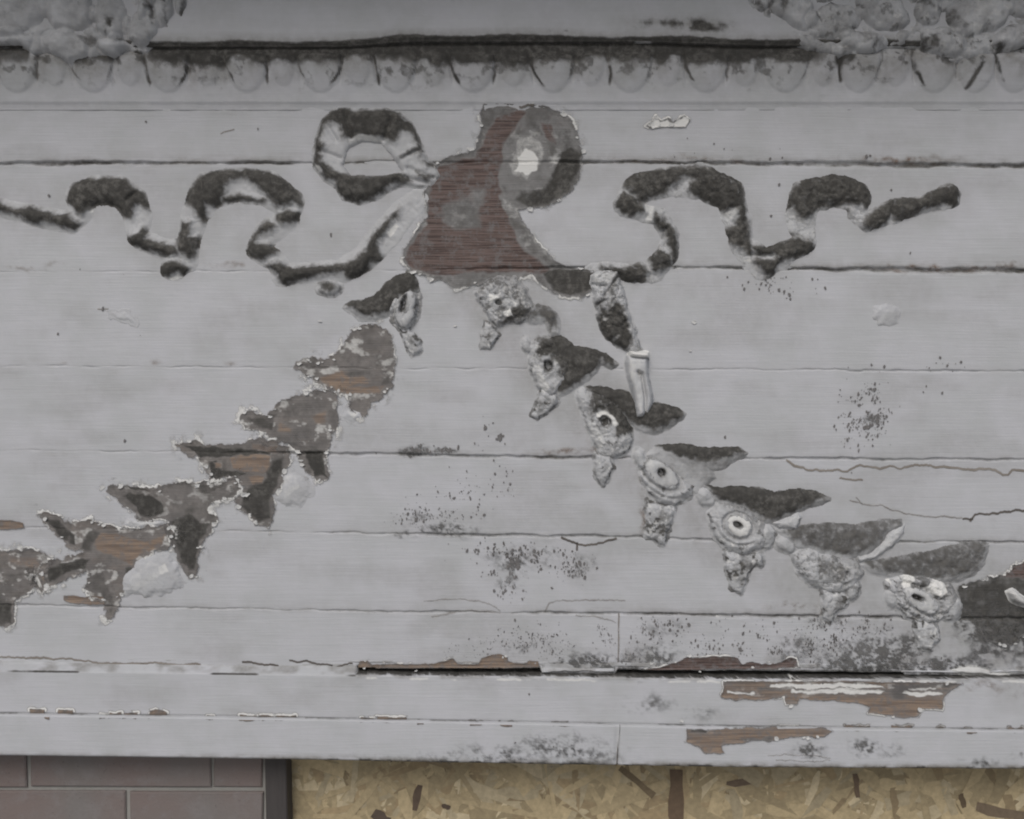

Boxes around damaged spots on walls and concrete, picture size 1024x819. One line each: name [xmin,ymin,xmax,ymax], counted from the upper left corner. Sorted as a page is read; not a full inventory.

peeling [400,103,594,300]
damp [833,363,900,452]
peeling [0,320,397,631]
crack [786,459,1024,522]
peeling [358,654,540,672]
damp [449,603,1024,674]
peeling [644,654,961,754]
peeling [957,560,1024,648]